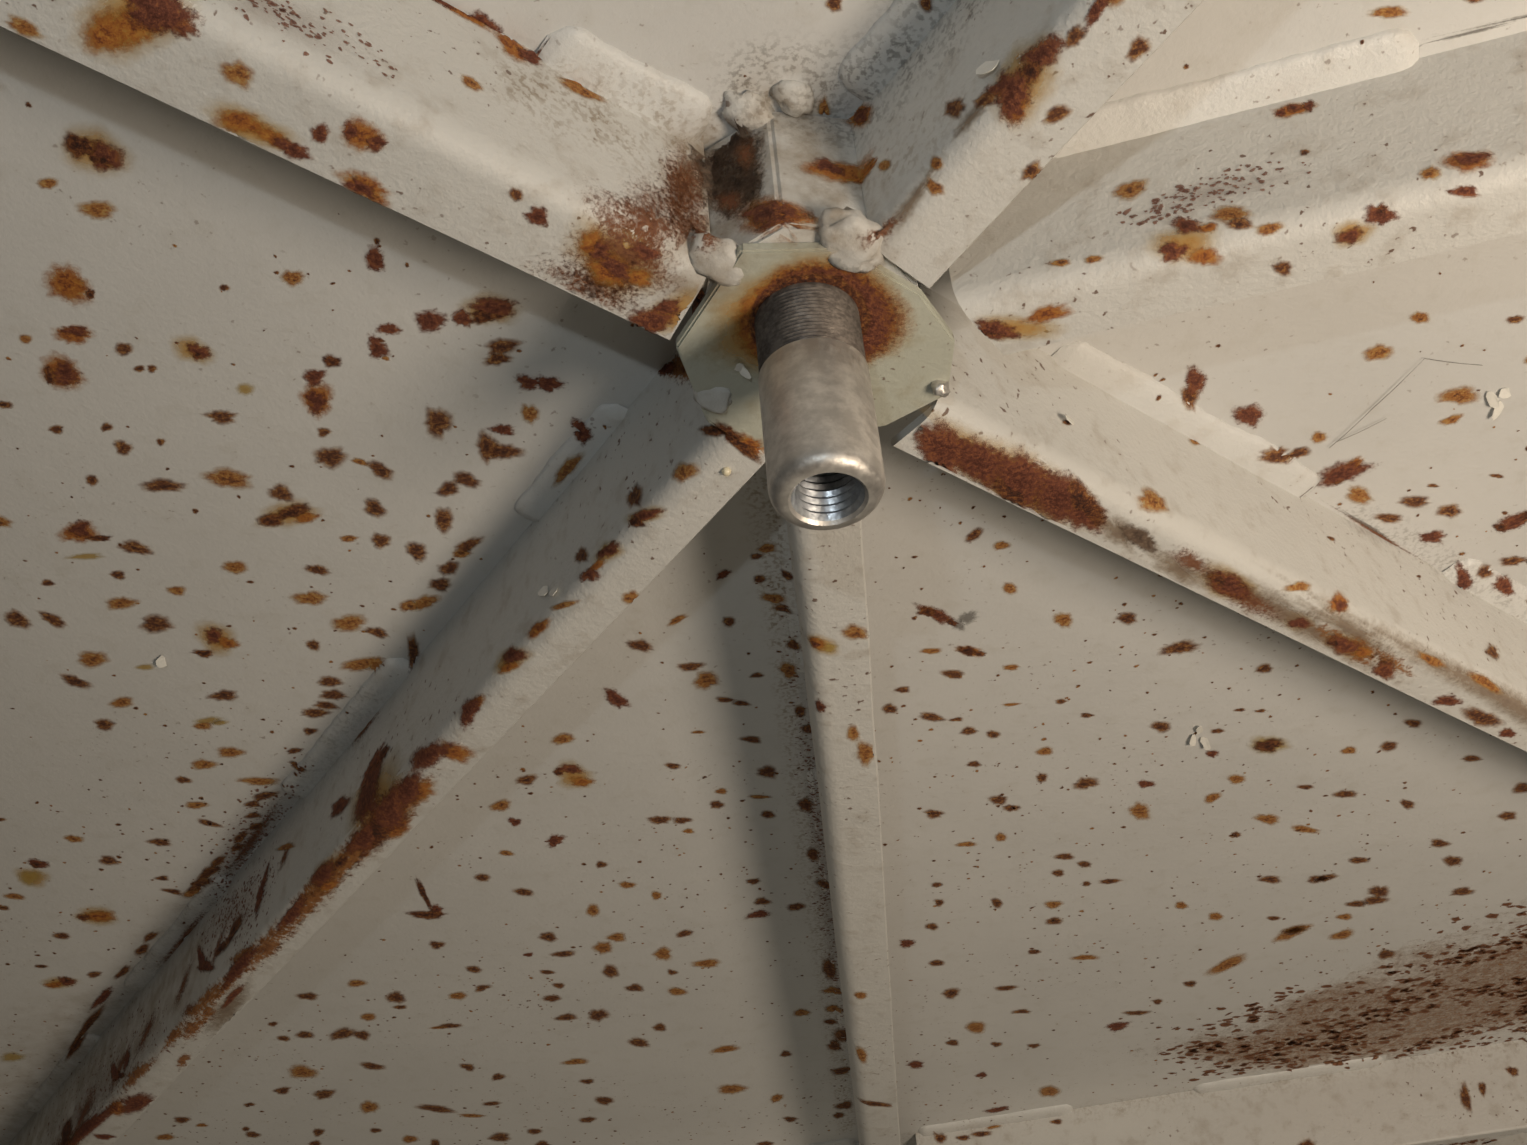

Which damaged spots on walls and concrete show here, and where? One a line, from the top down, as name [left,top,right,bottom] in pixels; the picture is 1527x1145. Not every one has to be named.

rust [86,0,199,51]
rust [945,0,1121,132]
rust [541,119,817,334]
rust [720,261,905,366]
rust [1440,387,1480,425]
rust [890,646,986,679]
rust [57,538,484,1145]
rust [883,683,1170,1014]
rust [35,909,158,1083]
rust [740,959,892,1134]
rust [906,1022,1060,1143]
rust [1107,832,1527,1086]